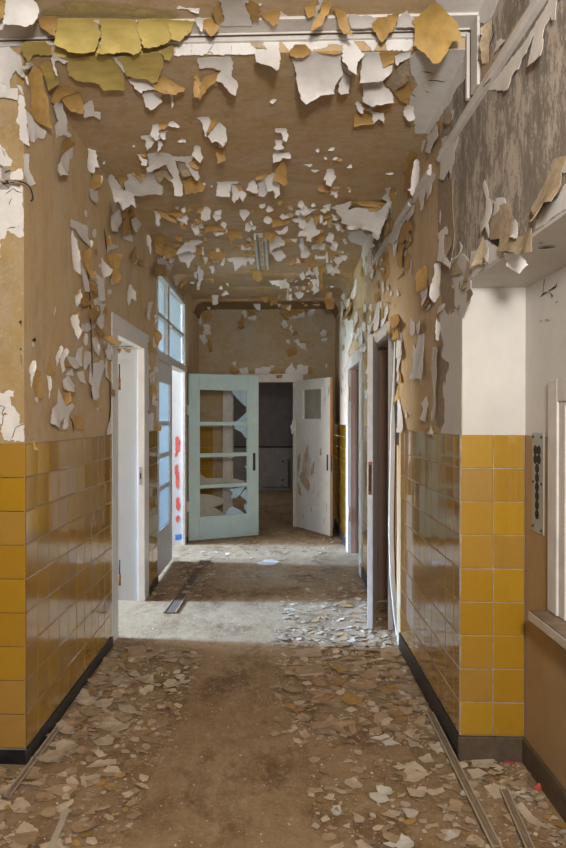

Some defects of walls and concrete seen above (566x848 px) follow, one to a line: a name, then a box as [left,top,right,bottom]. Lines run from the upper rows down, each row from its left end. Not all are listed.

peeling [297,445,319,496]